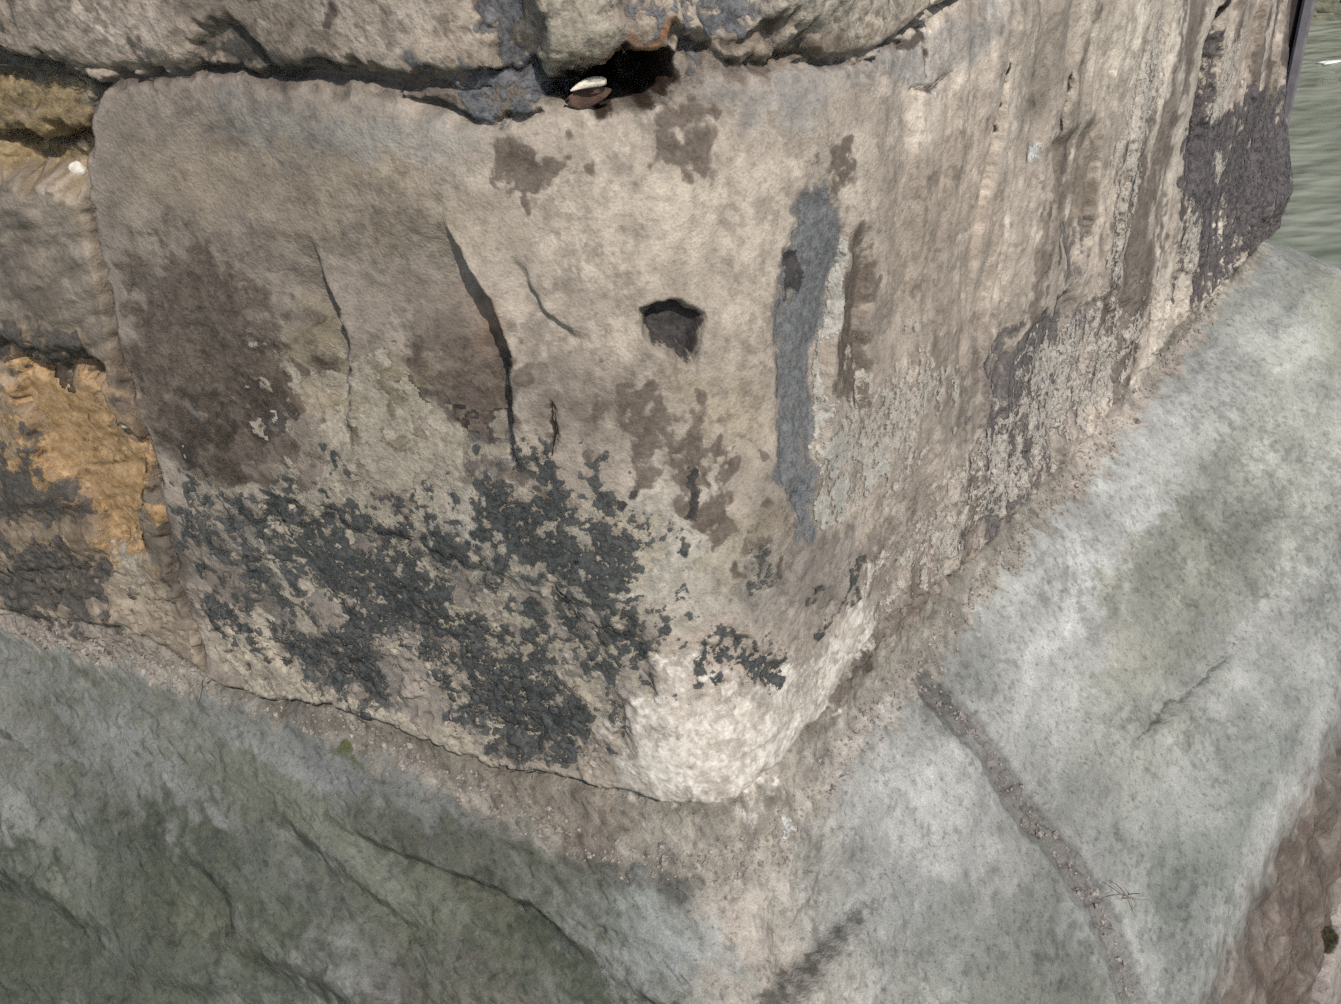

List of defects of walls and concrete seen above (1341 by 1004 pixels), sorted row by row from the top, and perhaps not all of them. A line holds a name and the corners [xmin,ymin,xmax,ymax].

corrosion [598,18,674,65]
damp [1093,0,1175,310]
damp [1181,23,1265,273]
peeling [0,64,1294,823]
damp [580,378,773,578]
damp [749,134,883,551]